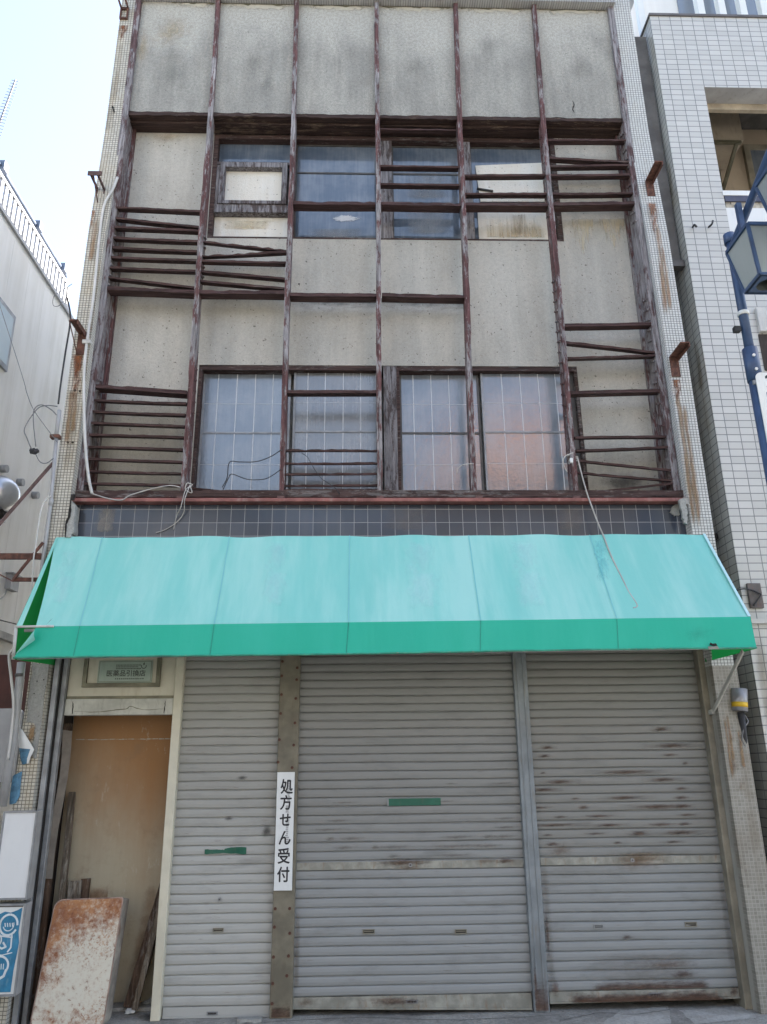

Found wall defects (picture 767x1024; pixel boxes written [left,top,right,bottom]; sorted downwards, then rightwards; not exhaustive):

rust [647,203,671,310]
rust [673,380,700,522]
rust [573,973,737,1002]